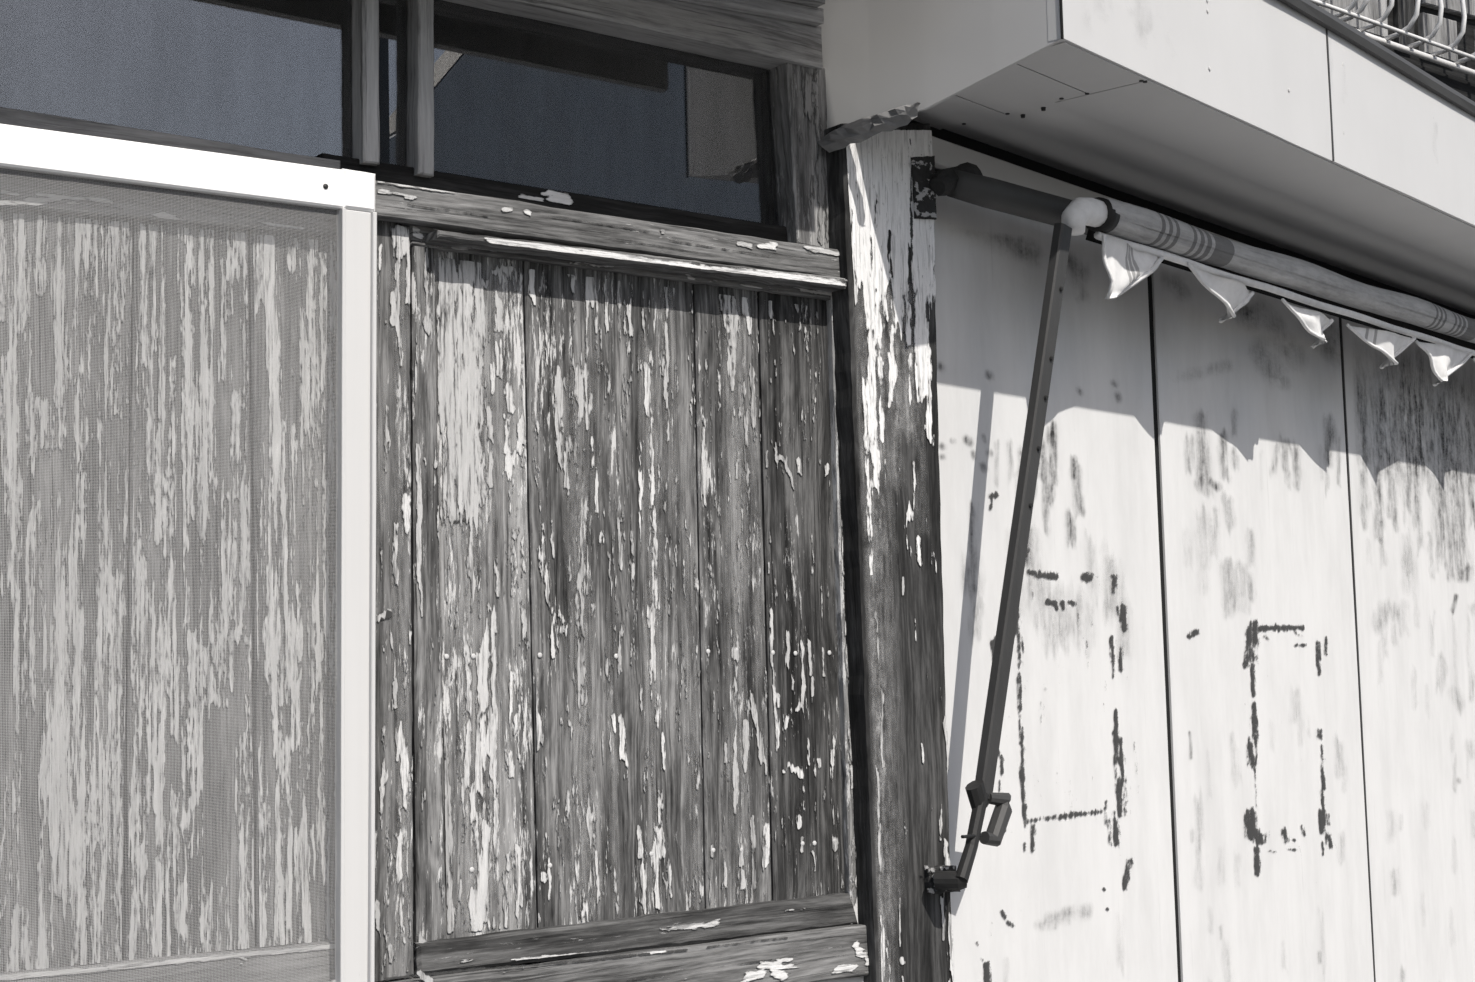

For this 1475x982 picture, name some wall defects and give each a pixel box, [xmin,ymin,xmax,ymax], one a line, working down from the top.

peeling [0,185,337,981]
peeling [375,66,937,982]
water stain [1363,364,1475,525]
peeling [927,673,949,771]
peeling [932,804,951,866]
peeling [940,892,954,982]